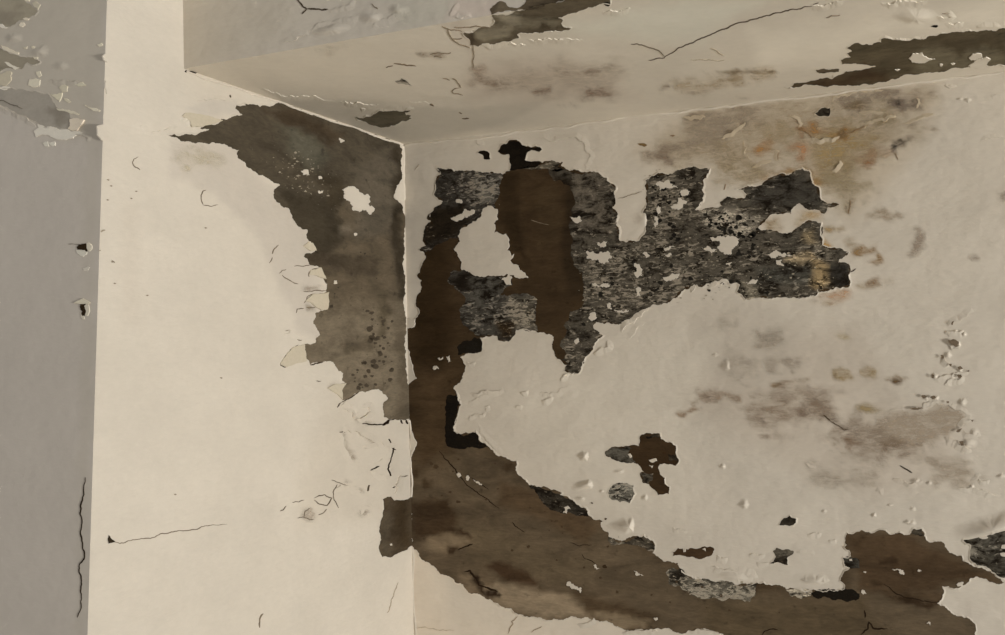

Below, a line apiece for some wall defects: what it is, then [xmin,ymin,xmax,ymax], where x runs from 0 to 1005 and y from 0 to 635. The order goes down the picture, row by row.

peeling [0,0,109,147]
crack [386,25,490,119]
peeling [462,0,631,50]
crack [631,3,840,62]
peeling [785,10,1005,118]
water stain [769,91,916,187]
spalling [74,298,90,320]
peeling [166,88,1005,635]
crack [281,419,408,520]
crack [77,477,86,617]
crack [108,524,226,544]